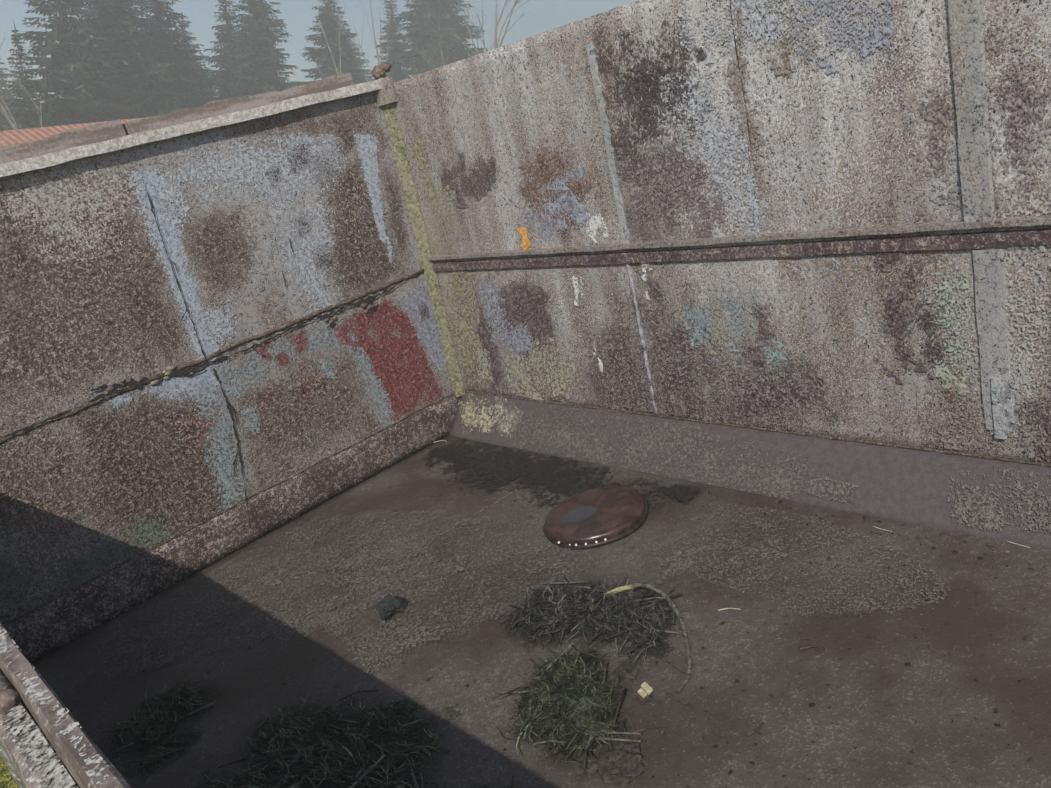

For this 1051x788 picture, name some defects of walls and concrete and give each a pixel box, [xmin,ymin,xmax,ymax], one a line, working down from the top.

crack [0,172,422,528]